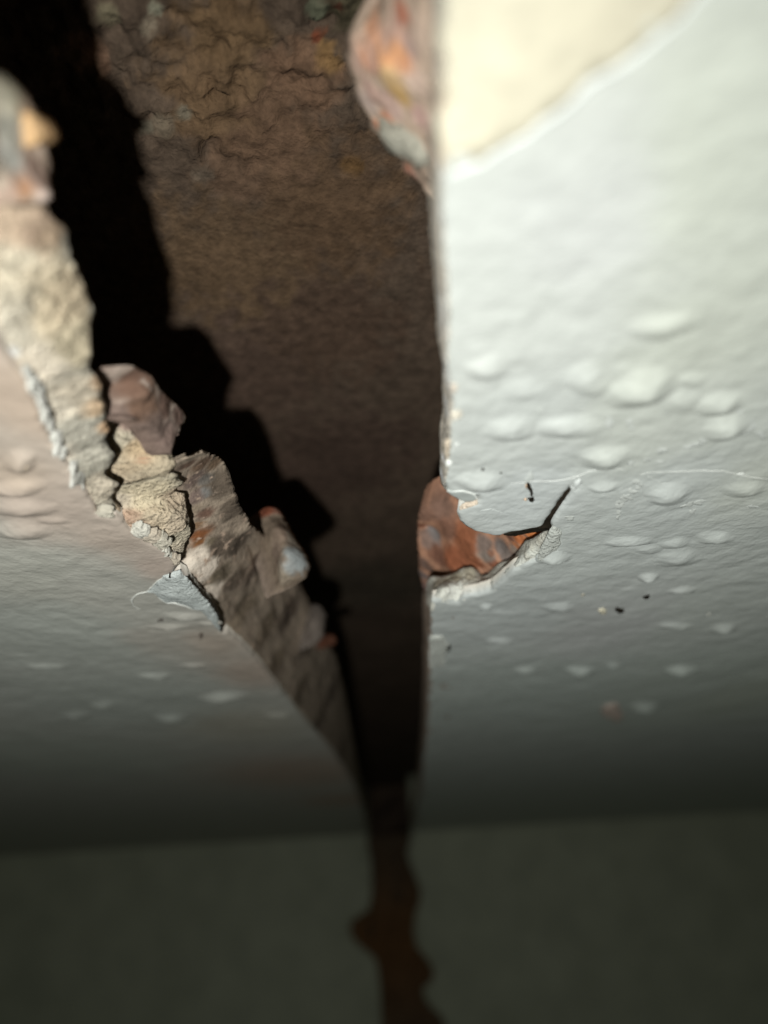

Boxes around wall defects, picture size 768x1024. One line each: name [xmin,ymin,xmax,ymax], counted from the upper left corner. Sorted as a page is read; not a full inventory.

flaking render [0,72,59,208]
peeling [94,504,115,518]
flaking render [130,520,223,632]
flaking render [249,506,311,598]
flaking render [417,439,562,611]
crack [511,438,766,529]